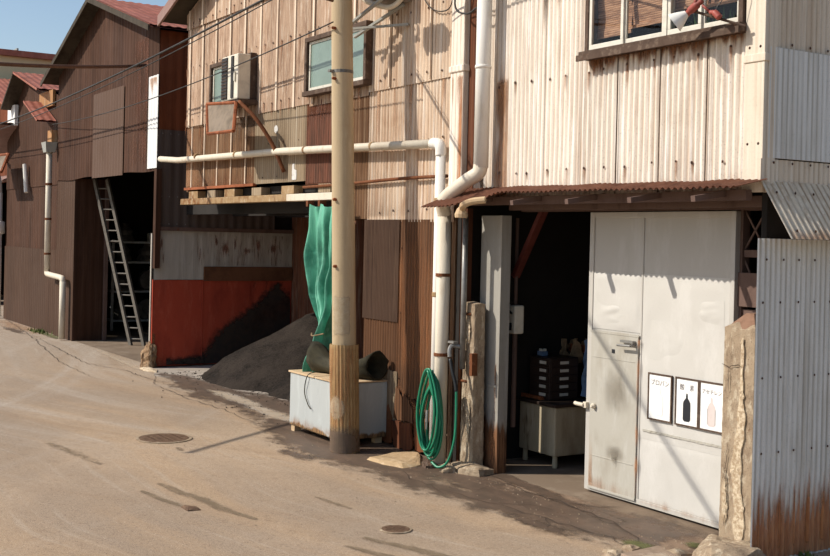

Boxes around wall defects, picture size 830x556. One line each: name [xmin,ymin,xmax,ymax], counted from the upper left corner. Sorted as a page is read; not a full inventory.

corrosion [495,81,516,196]
corrosion [382,386,430,453]
corrosion [752,485,830,556]